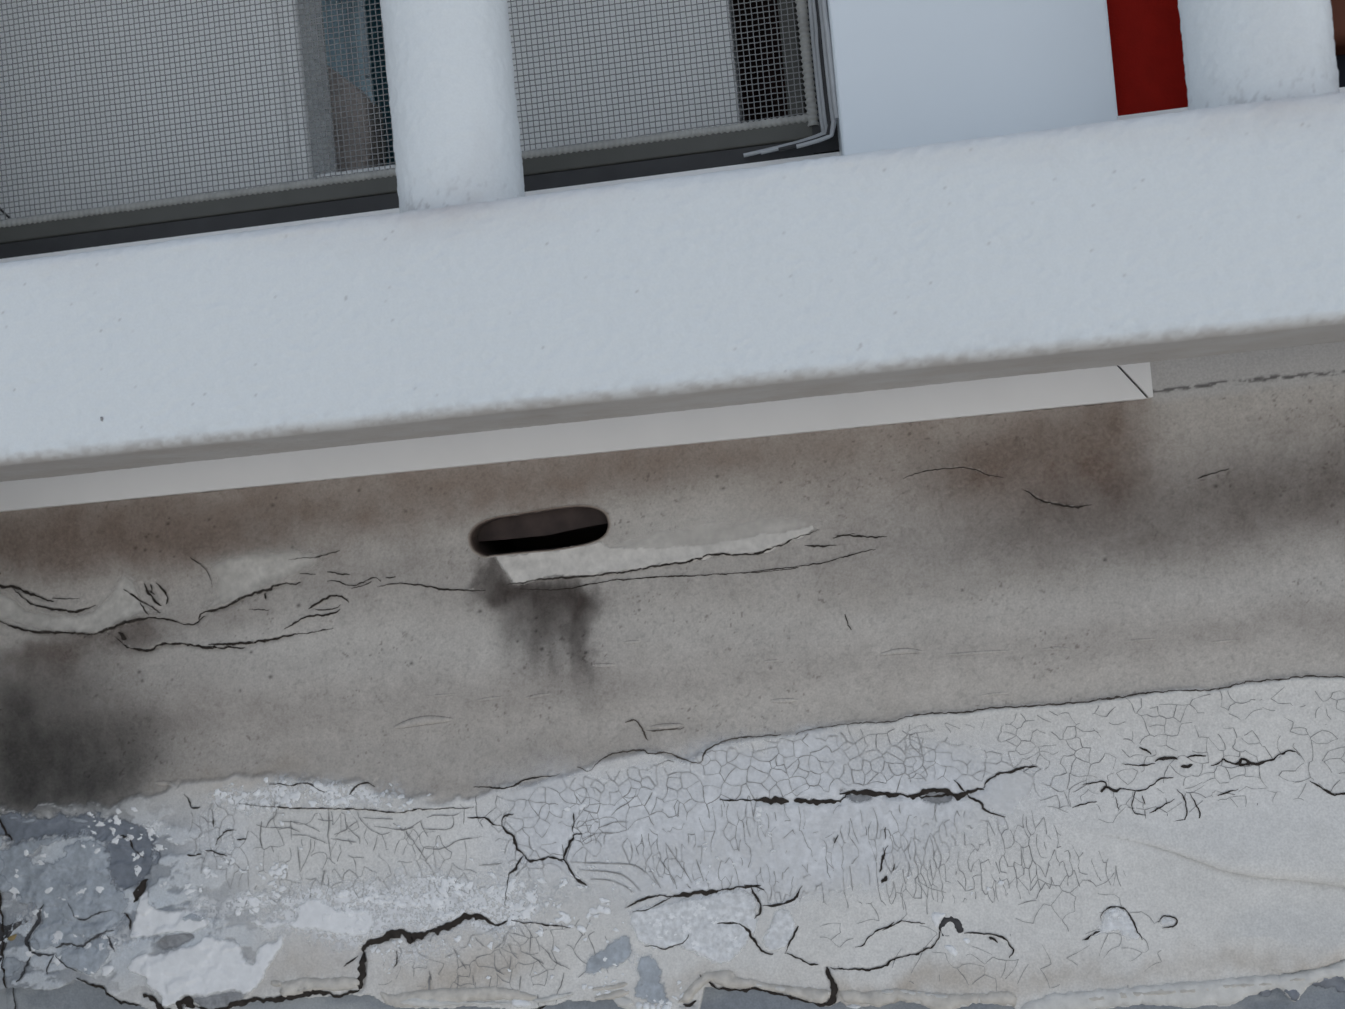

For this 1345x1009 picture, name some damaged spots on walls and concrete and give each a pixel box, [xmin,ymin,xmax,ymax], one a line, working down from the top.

crack [0,530,887,652]
water stain [485,561,595,647]
peeling [496,522,814,583]
water stain [0,697,178,876]
spalling [0,812,161,977]
water stain [4,730,1008,1009]
crack [0,688,1345,1009]
peeling [271,976,360,997]
peeling [380,986,573,1008]